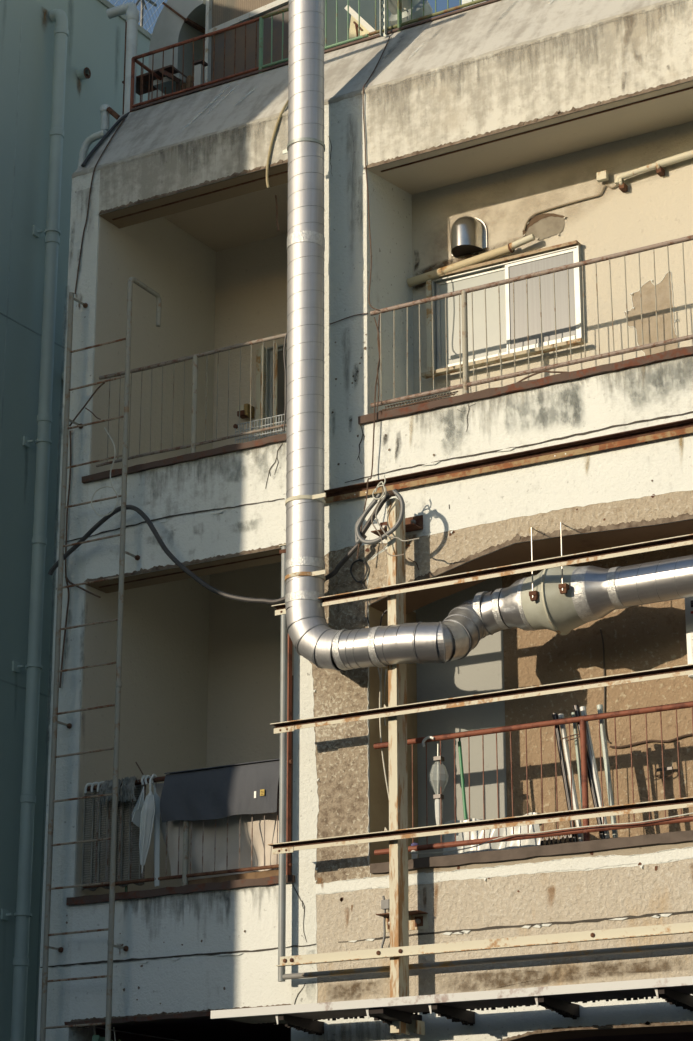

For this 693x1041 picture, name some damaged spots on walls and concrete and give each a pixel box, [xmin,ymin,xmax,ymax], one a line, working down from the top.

peeling [624,271,679,356]